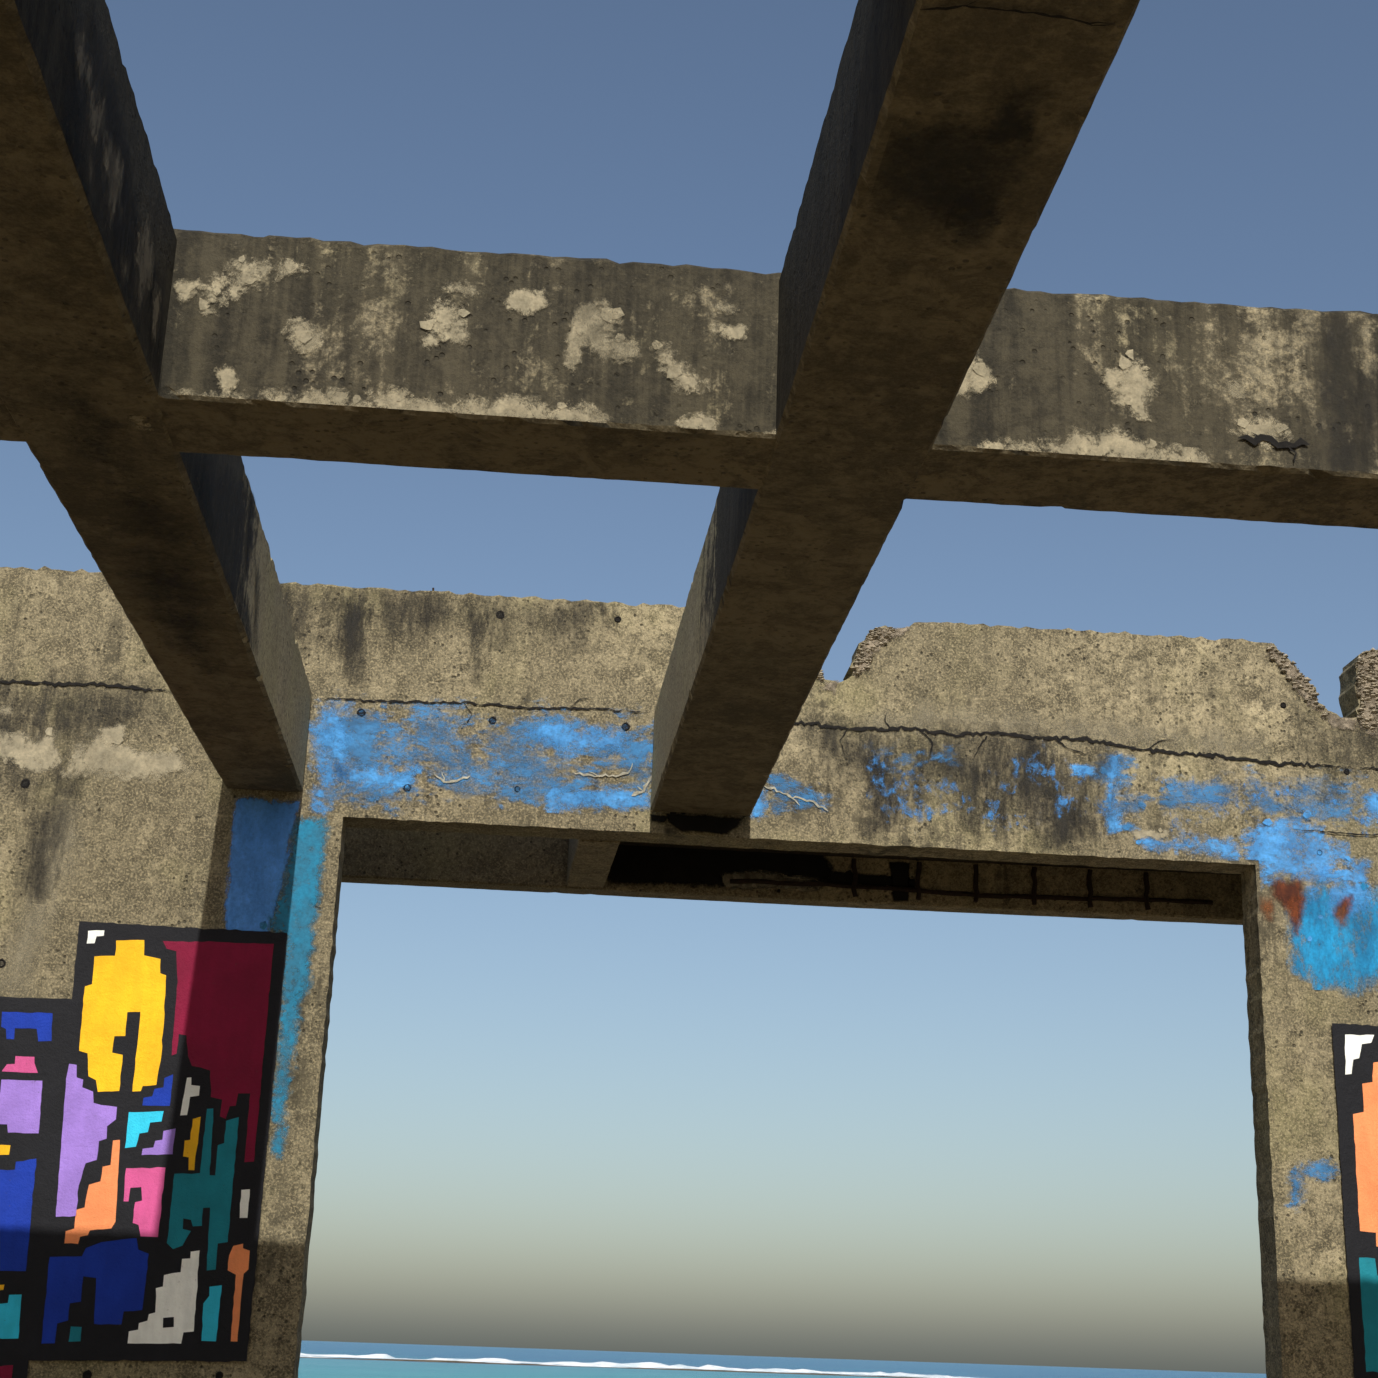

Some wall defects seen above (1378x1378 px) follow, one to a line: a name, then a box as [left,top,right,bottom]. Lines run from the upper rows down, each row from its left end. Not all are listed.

crack [0,679,171,692]
crack [322,697,649,722]
peeling [1014,755,1378,990]
peeling [224,703,1213,1154]
rust [1265,880,1304,932]
rust [1337,896,1353,923]
peeling [1287,1162,1338,1207]